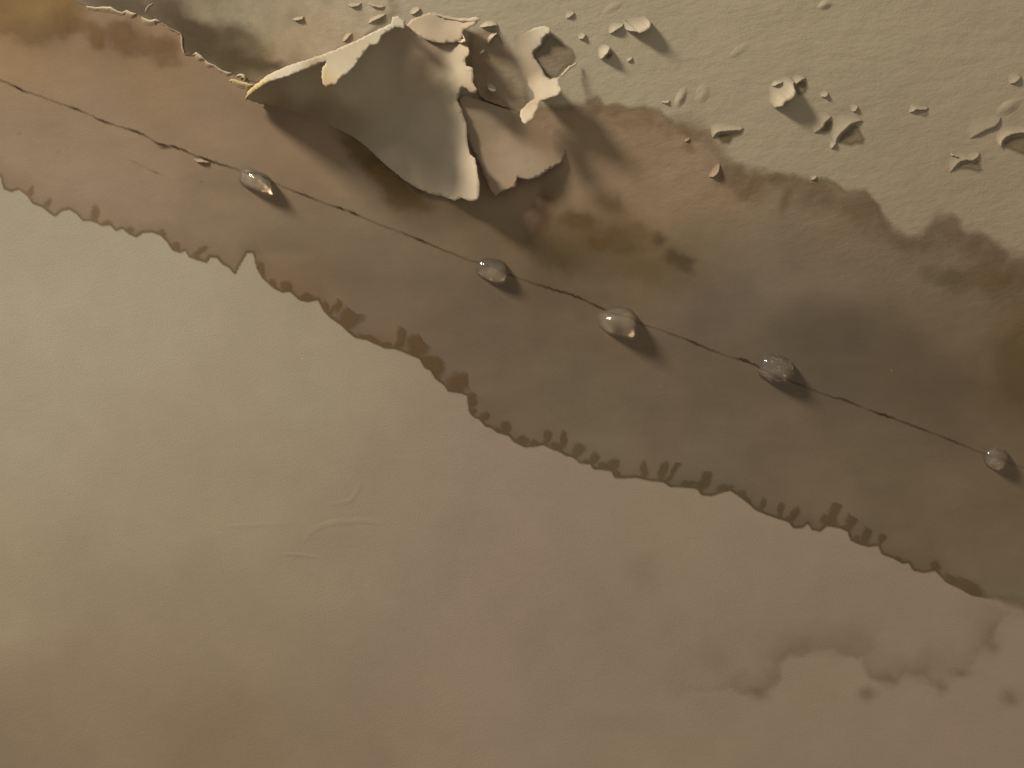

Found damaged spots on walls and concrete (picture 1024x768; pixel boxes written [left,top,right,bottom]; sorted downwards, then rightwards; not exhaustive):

peeling [74,0,577,201]
peeling [769,75,806,108]
crack [72,107,218,164]
peeling [710,123,744,142]
peeling [812,104,863,149]
peeling [968,114,1024,154]
peeling [949,151,981,173]
water stain [0,0,1024,606]